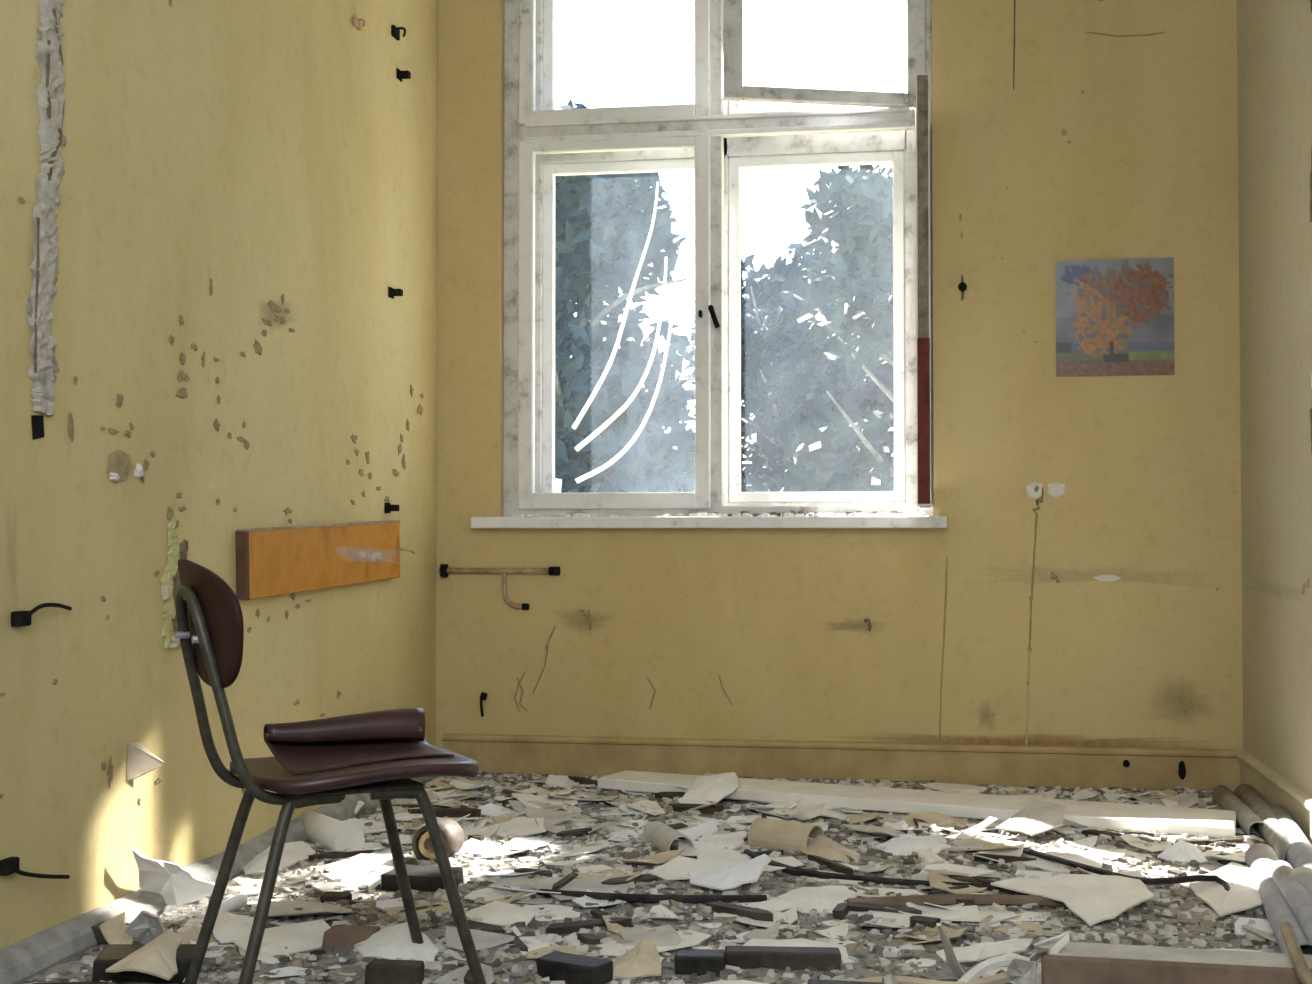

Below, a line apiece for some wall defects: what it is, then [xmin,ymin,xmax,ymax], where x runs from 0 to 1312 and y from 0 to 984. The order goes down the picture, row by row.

crack [1304,146,1312,223]
spalling [31,415,45,440]
flaking render [100,422,155,483]
crack [1304,375,1312,453]
peeling [155,492,189,649]